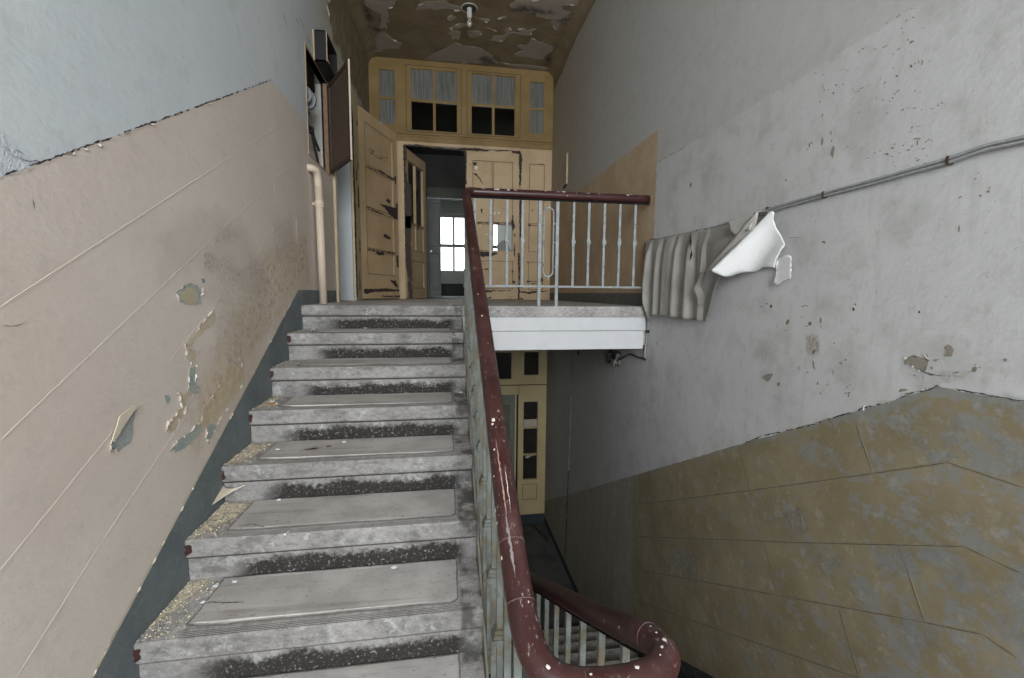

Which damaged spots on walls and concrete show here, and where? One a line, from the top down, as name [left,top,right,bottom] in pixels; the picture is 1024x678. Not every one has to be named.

peeling [364,0,401,52]
peeling [417,0,579,70]
flaking render [0,132,39,178]
peeling [164,282,257,453]
flaking render [904,345,954,376]
peeling [110,405,139,454]